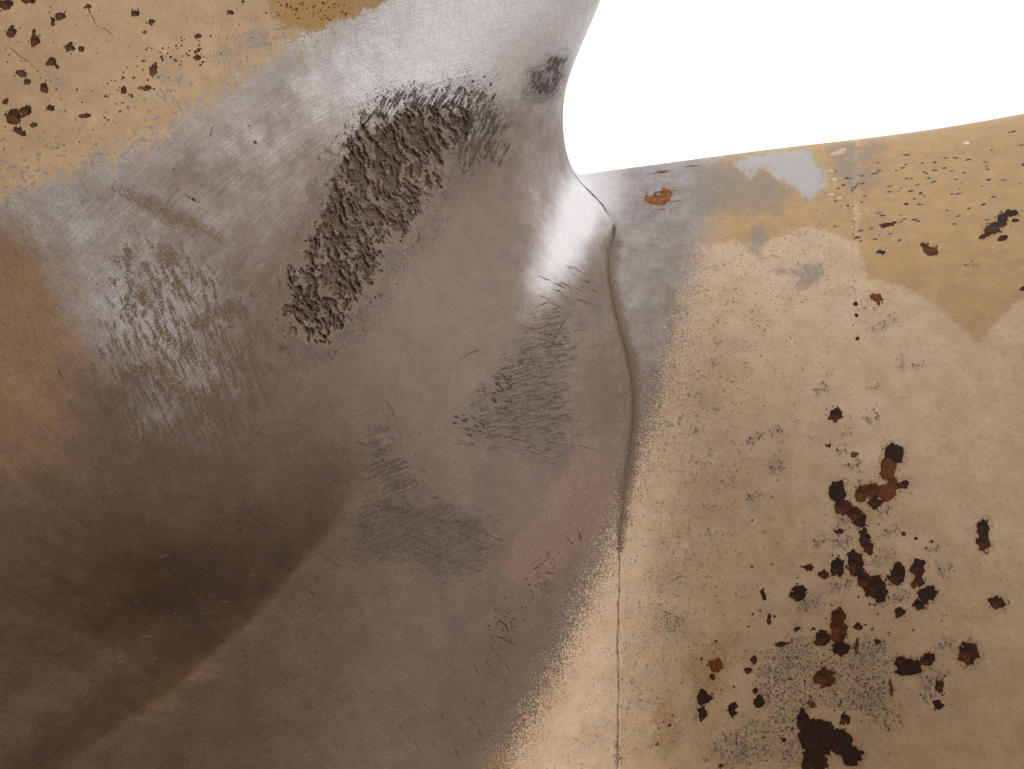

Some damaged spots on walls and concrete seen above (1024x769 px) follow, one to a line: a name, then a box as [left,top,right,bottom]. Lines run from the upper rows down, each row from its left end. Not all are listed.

corrosion [2,98,38,136]
spalling [254,45,572,381]
corrosion [978,209,1019,241]
corrosion [825,406,844,423]
crack [573,173,643,769]
corrosion [802,439,940,618]
corrosion [972,514,996,555]
corrosion [787,583,808,603]
corrosion [647,628,758,763]
corrosion [791,600,870,769]
corrosion [889,649,945,710]
corrosion [952,638,986,673]